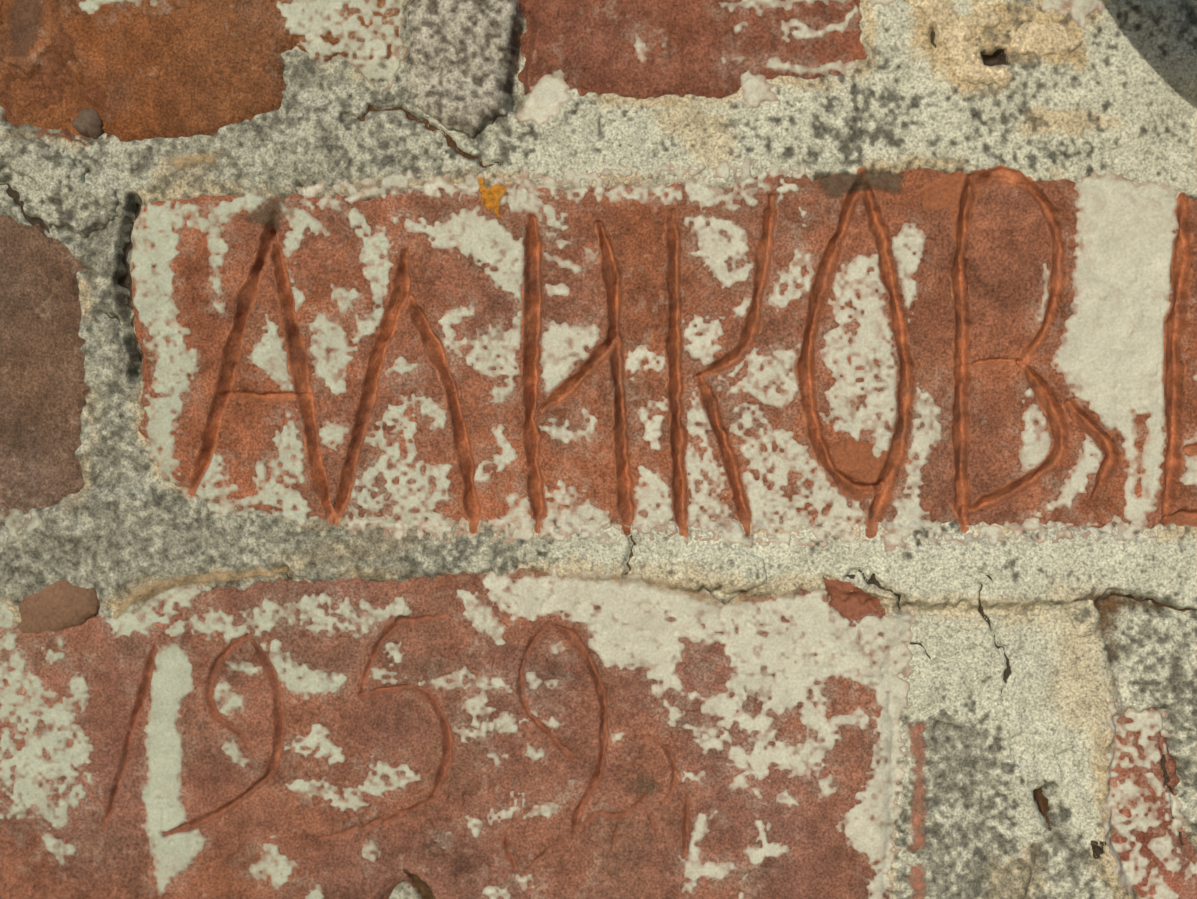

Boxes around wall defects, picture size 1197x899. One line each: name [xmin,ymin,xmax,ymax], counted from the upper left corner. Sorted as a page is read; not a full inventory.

peeling [276,0,409,89]
peeling [516,69,573,126]
peeling [130,157,806,527]
peeling [342,169,1179,551]
peeling [0,599,94,865]
peeling [103,584,421,896]
peeling [368,641,565,761]
peeling [456,565,918,899]
crack [846,570,901,609]
crack [974,572,1012,701]
peeling [1090,700,1197,899]
crack [1116,594,1191,612]